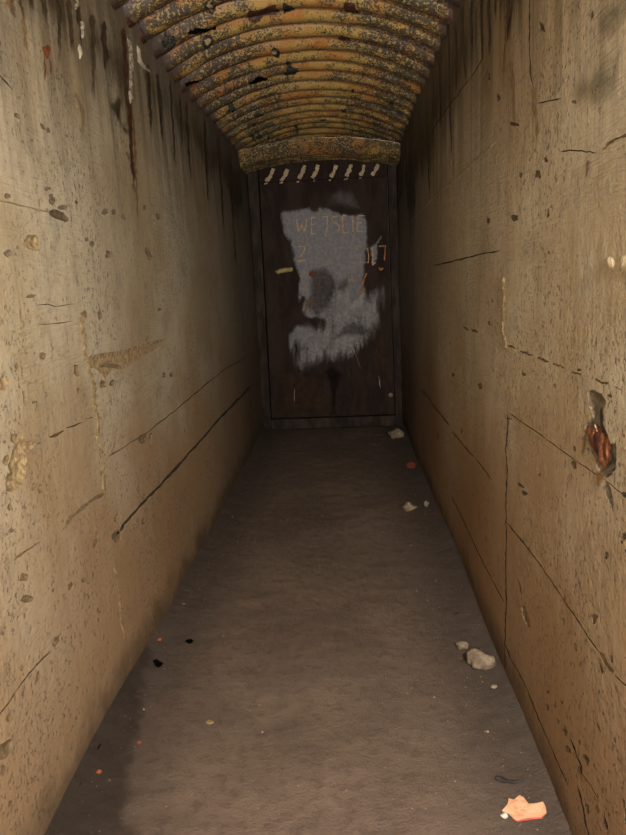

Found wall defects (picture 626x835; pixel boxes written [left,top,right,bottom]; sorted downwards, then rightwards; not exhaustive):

water stain [31,0,135,179]
water stain [147,63,242,256]
corrosion [247,3,294,23]
corrosion [344,2,358,14]
crack [117,386,251,534]
crack [451,414,626,835]